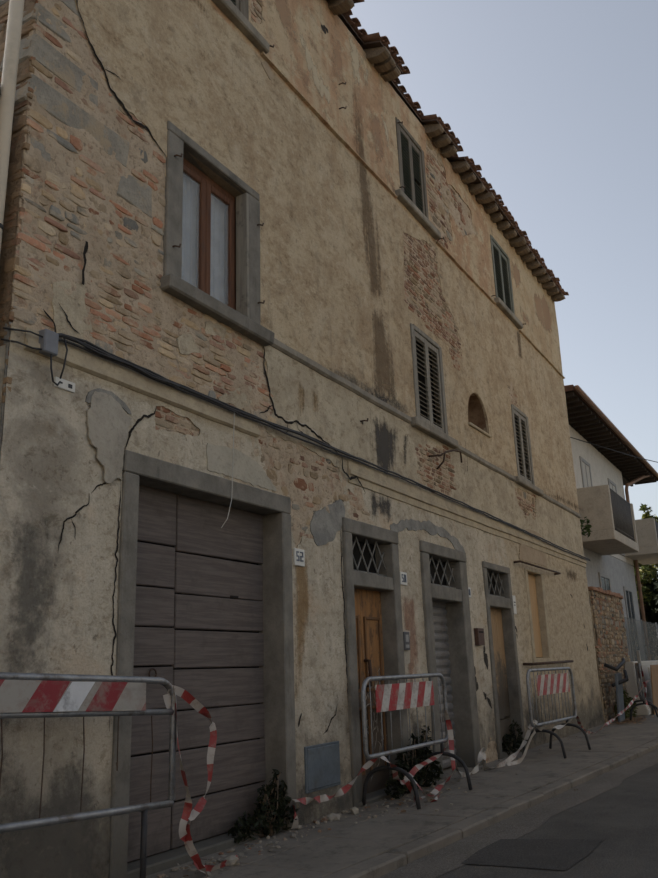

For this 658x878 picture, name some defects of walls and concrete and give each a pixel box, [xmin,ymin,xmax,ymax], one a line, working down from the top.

crack [76,0,165,154]
peeling [7,0,370,555]
leakage [356,116,381,294]
peeling [403,138,476,371]
crack [125,406,157,449]
crack [260,345,365,492]
leakage [373,313,395,403]
leakage [374,418,406,472]
peeling [415,443,457,501]
peeling [515,488,537,520]
leakage [10,525,52,668]
crack [58,481,121,676]